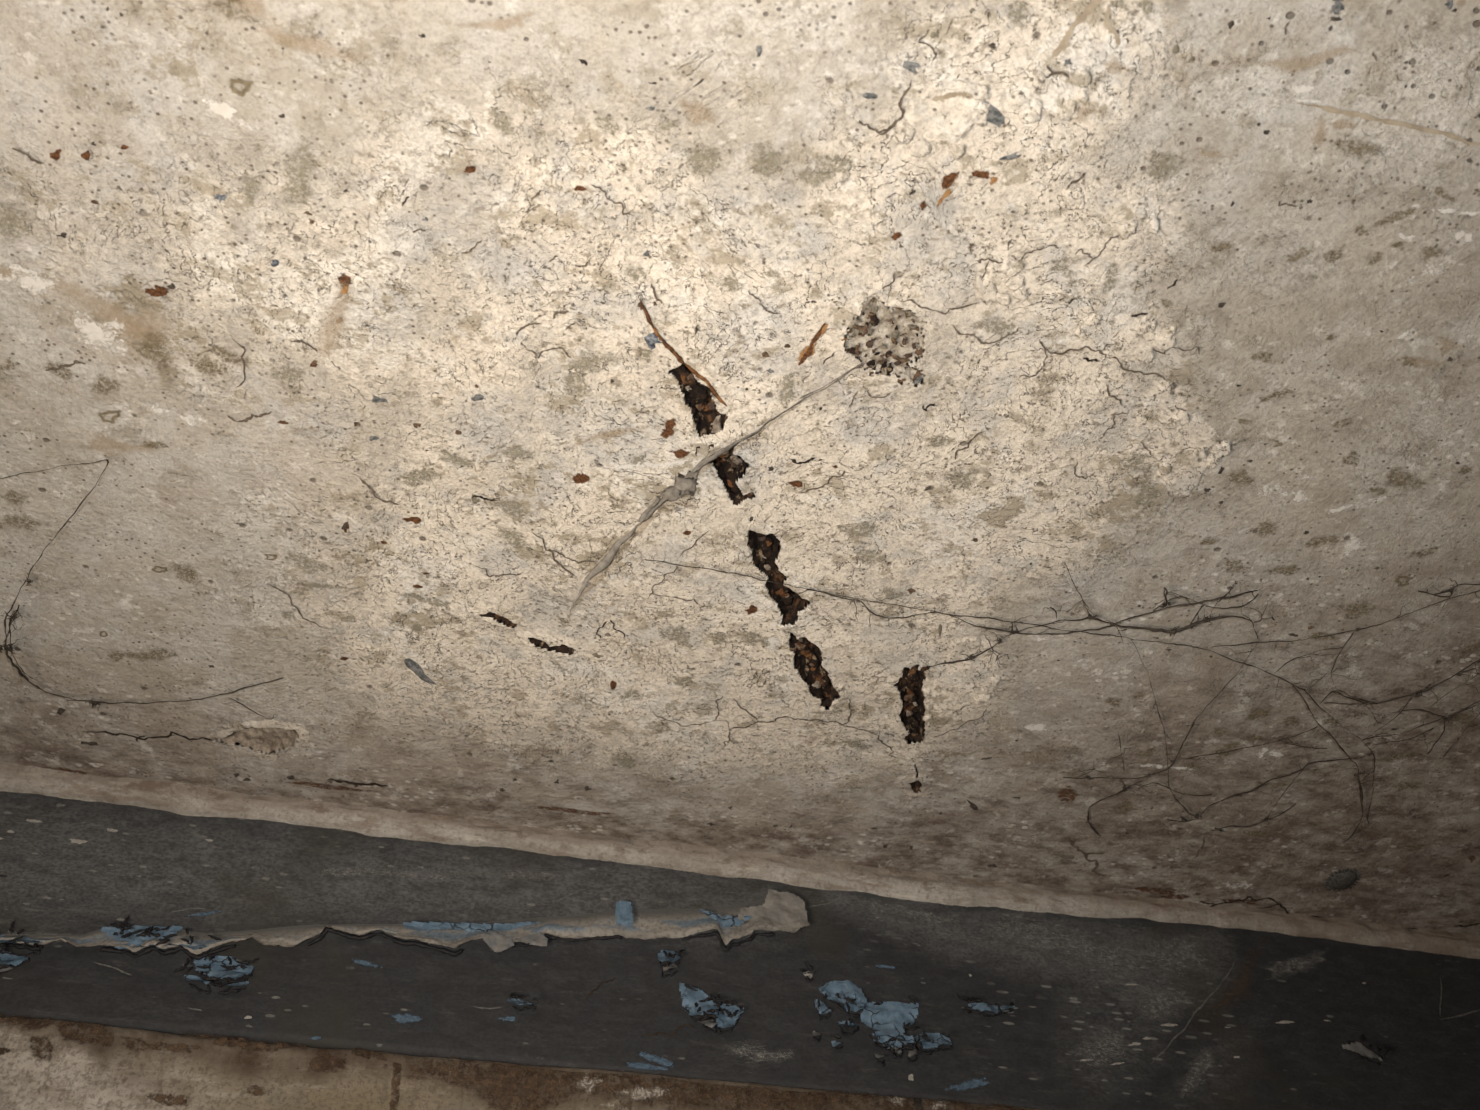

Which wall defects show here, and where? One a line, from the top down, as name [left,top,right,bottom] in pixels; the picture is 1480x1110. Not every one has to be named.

spalling [823,280,946,400]
crack [269,584,323,628]
crack [596,620,625,639]
rust [660,418,690,458]
crack [648,530,710,605]
spalling [644,332,851,716]
crack [791,457,845,495]
flaking render [883,624,1004,750]
peeling [0,889,810,1034]
peeling [799,962,952,1067]